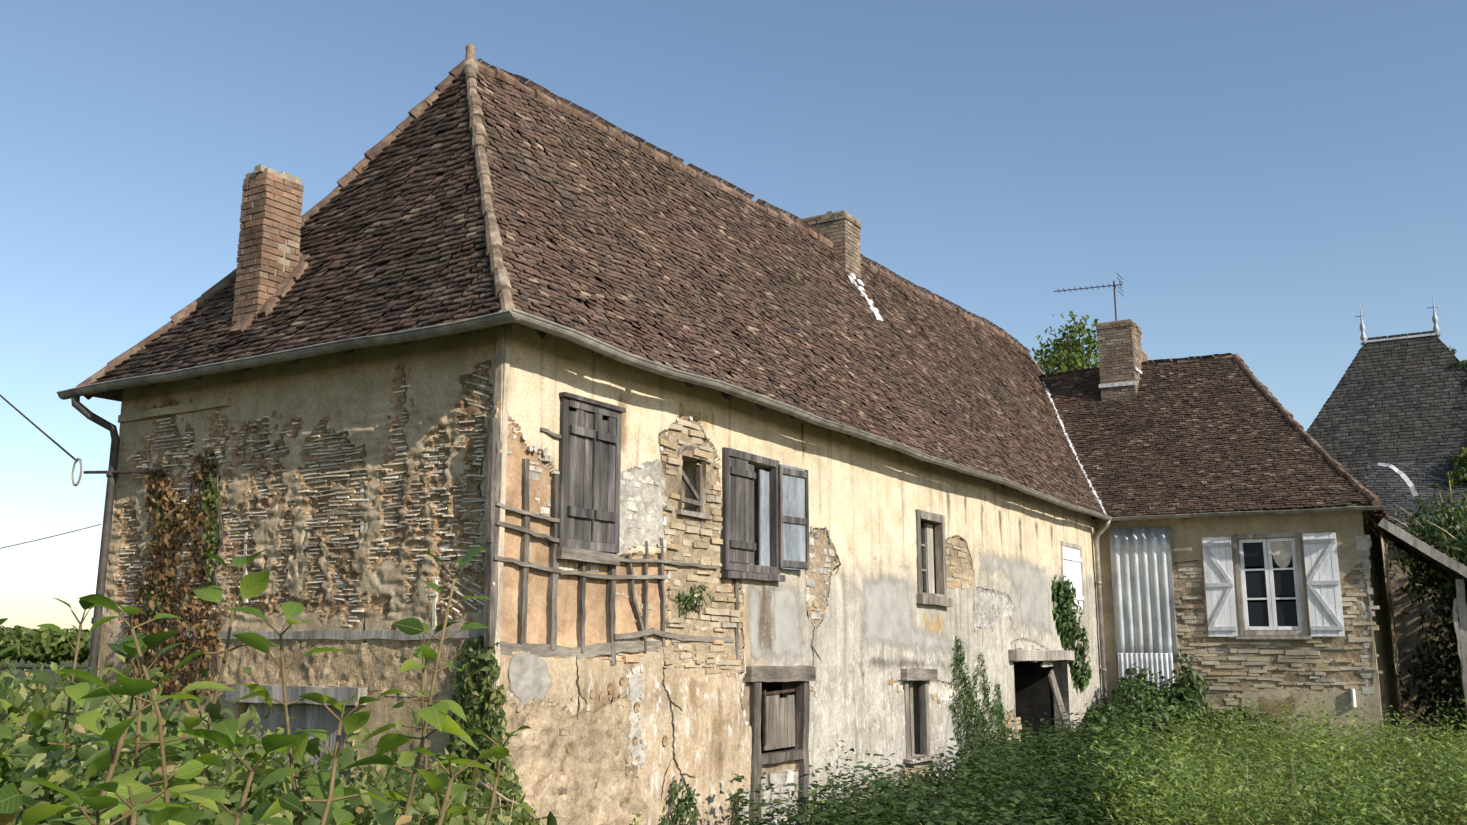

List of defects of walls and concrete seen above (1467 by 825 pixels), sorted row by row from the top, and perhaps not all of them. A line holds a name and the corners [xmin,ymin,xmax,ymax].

peeling [113,360,752,825]
spalling [805,526,840,627]
crack [661,658,700,821]